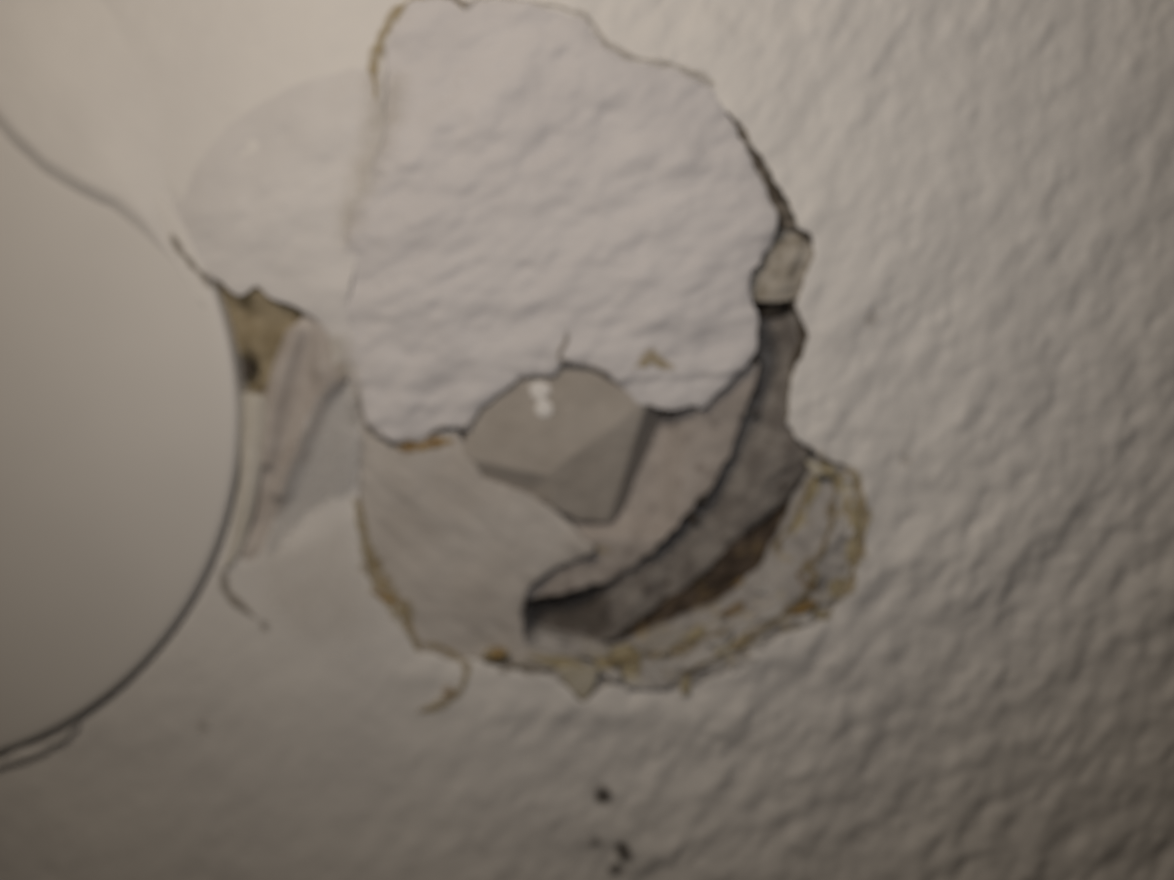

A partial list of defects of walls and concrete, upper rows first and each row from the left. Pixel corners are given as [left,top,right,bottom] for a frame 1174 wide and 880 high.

flaking render [214,0,862,700]